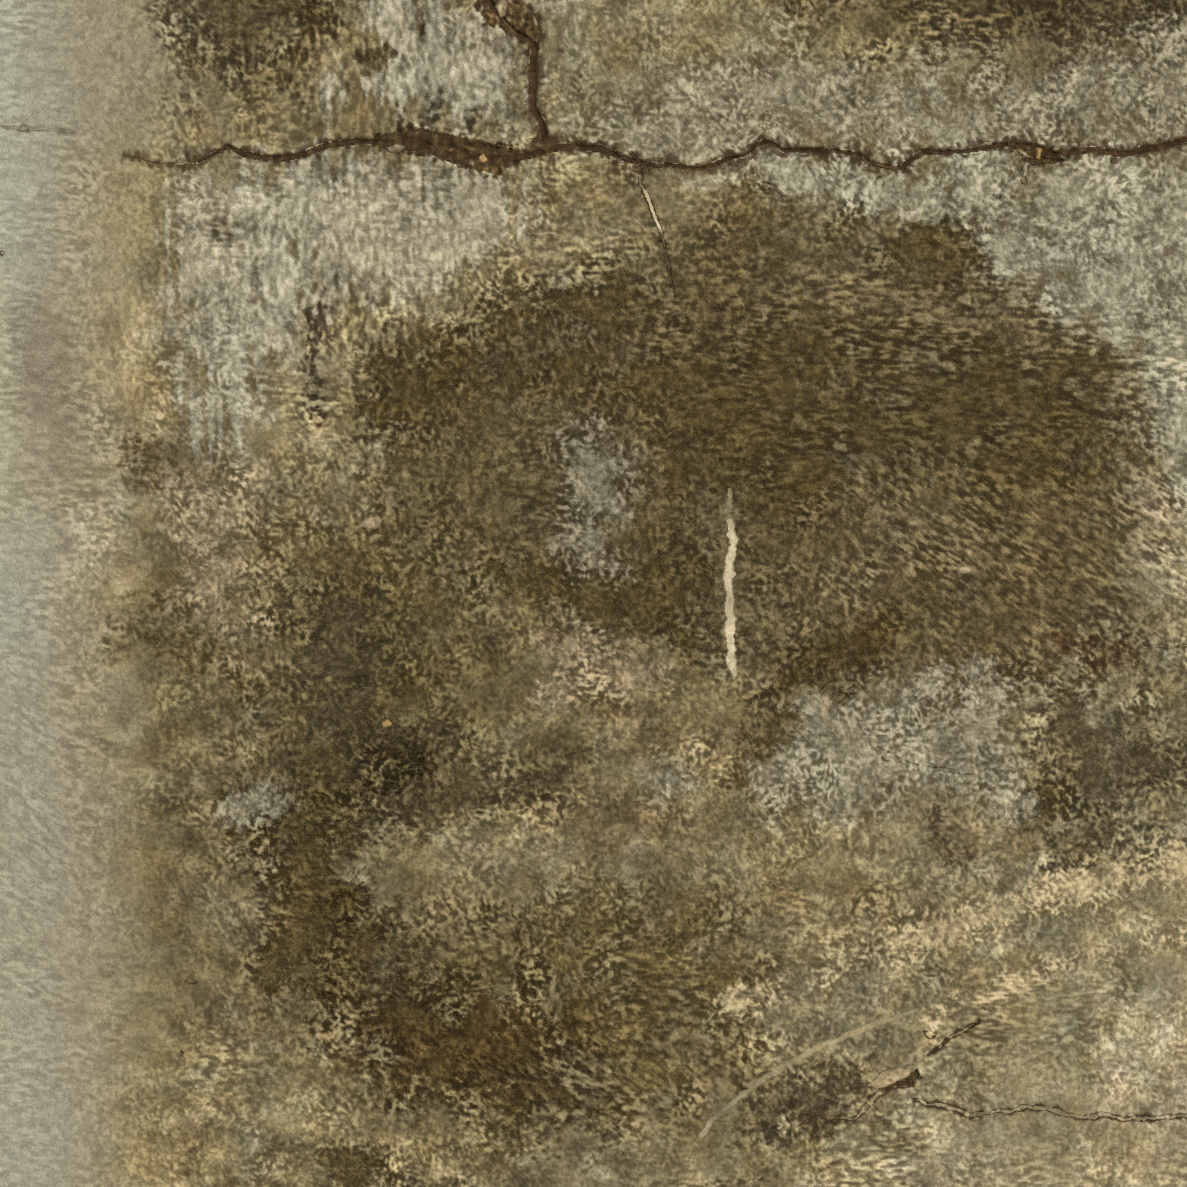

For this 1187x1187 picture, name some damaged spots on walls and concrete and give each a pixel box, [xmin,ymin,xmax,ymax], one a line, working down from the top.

crack [0,124,77,133]
crack [122,0,1187,298]
leakage [227,169,1187,1147]
crack [799,1019,1187,1127]